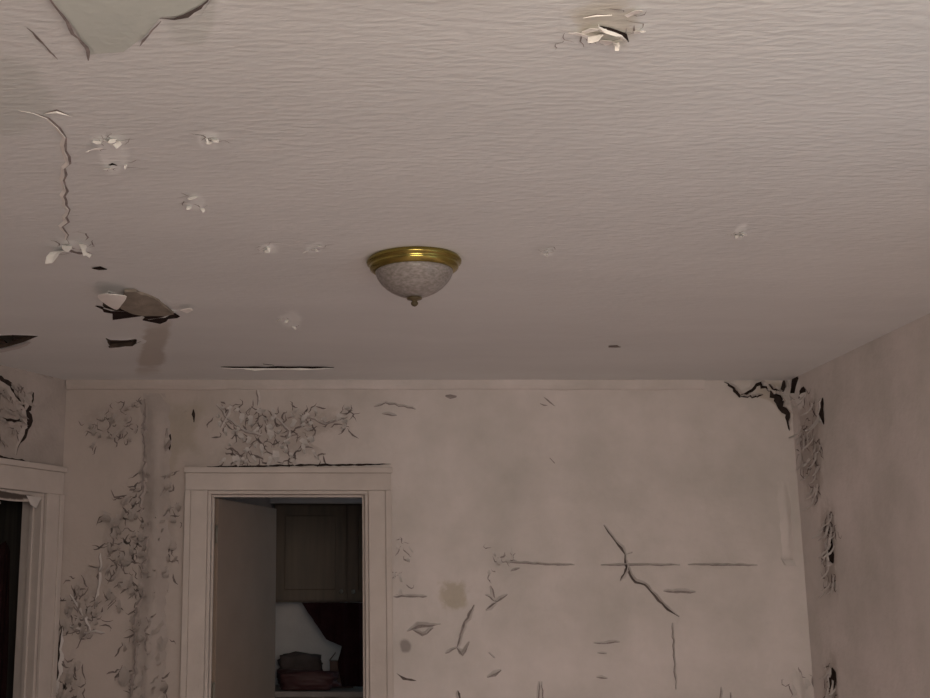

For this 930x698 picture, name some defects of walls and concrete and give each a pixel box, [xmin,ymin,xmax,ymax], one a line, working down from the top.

spalling [555,0,647,55]
crack [18,109,72,240]
crack [0,376,34,461]
crack [221,364,334,406]
crack [724,377,824,431]
crack [503,561,575,571]
crack [824,537,834,568]
crack [56,553,105,695]
crack [393,592,427,600]
crack [407,586,508,678]
crack [601,524,757,690]
crack [824,664,836,690]